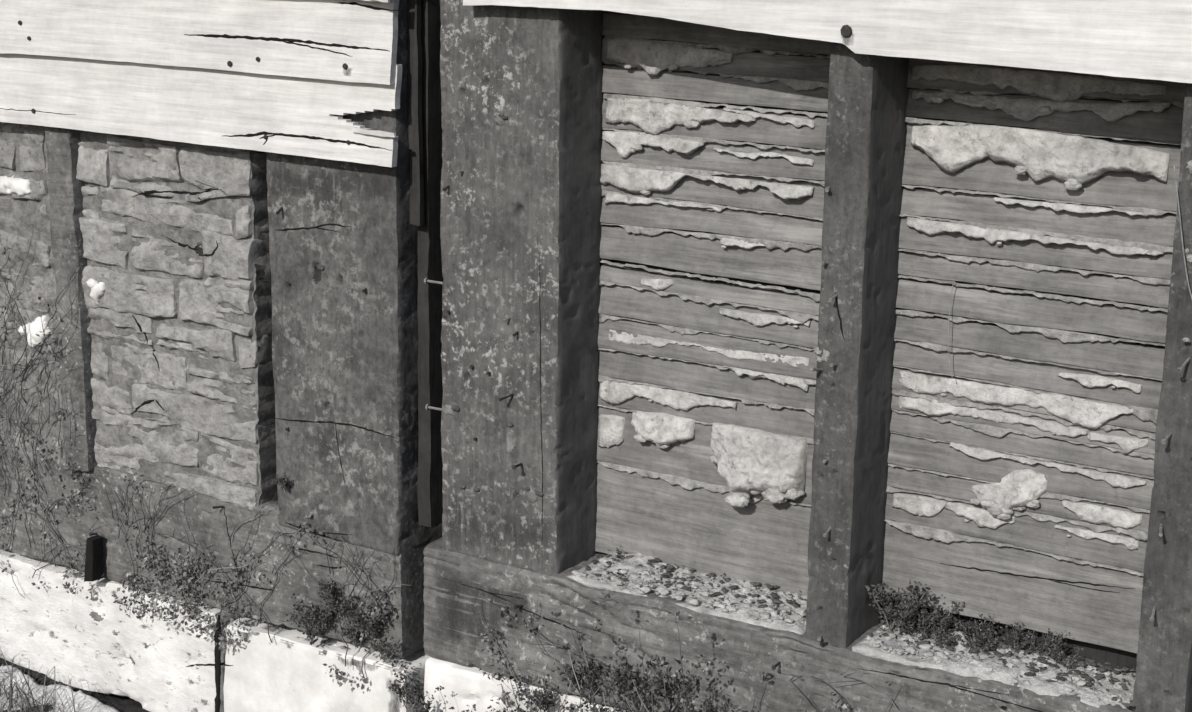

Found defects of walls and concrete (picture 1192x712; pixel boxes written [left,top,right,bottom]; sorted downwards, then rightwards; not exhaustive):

crack [338,2,397,11]
crack [184,34,388,56]
crack [224,131,388,150]
peeling [1064,179,1082,191]